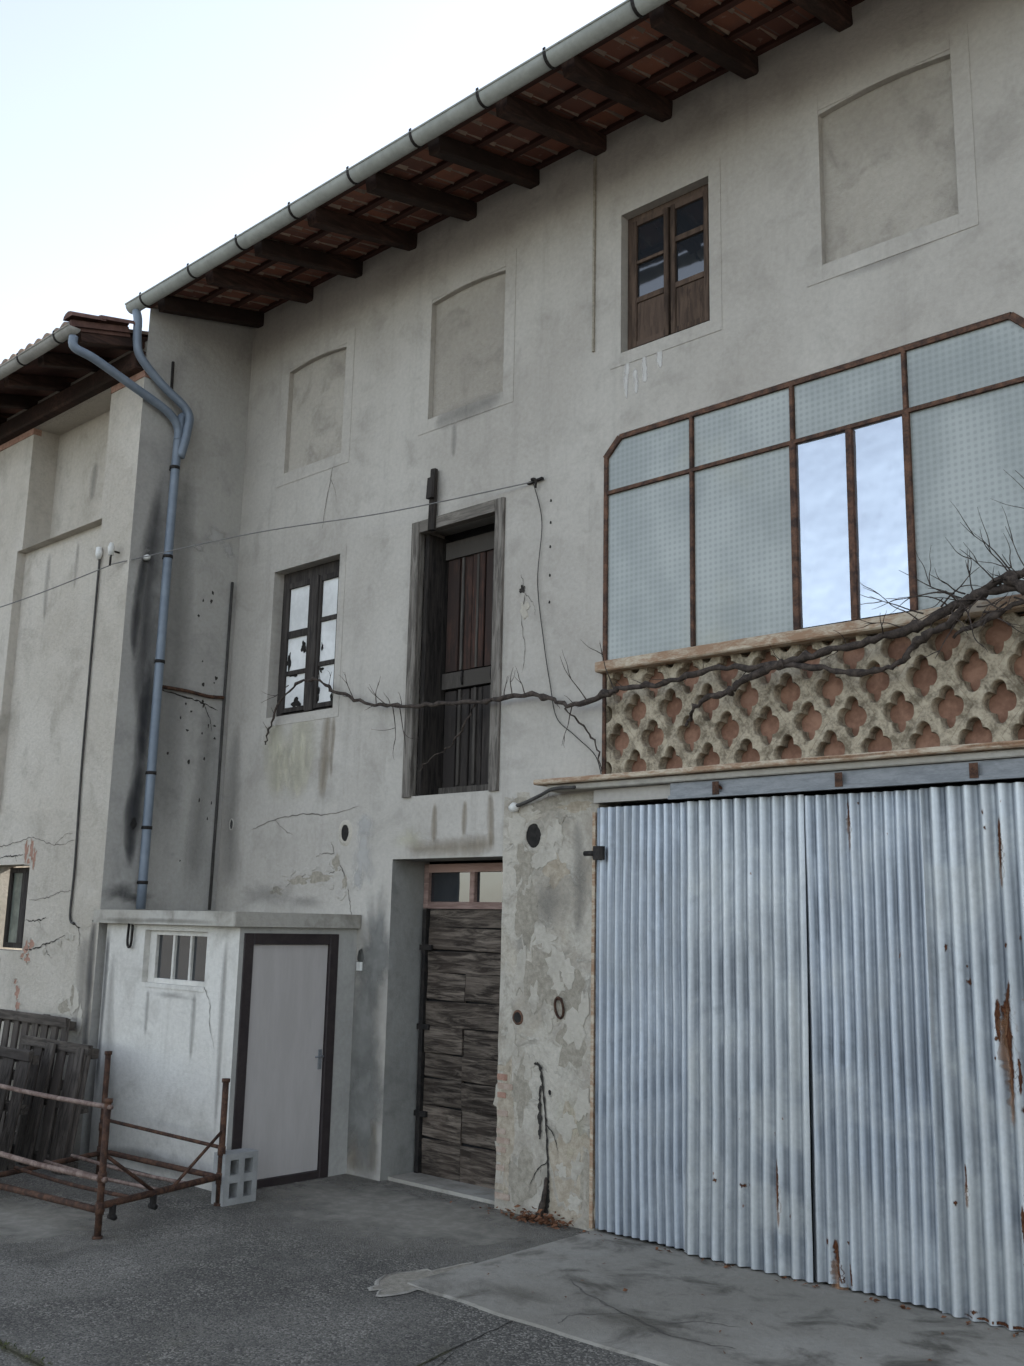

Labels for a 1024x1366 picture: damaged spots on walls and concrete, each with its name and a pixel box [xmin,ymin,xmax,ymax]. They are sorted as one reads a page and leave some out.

leakage [128,509,158,855]
crack [0,833,73,858]
crack [254,806,358,914]
spalling [270,820,353,901]
spalling [493,811,595,1231]
rust [994,982,1024,1119]
rust [826,1239,853,1290]